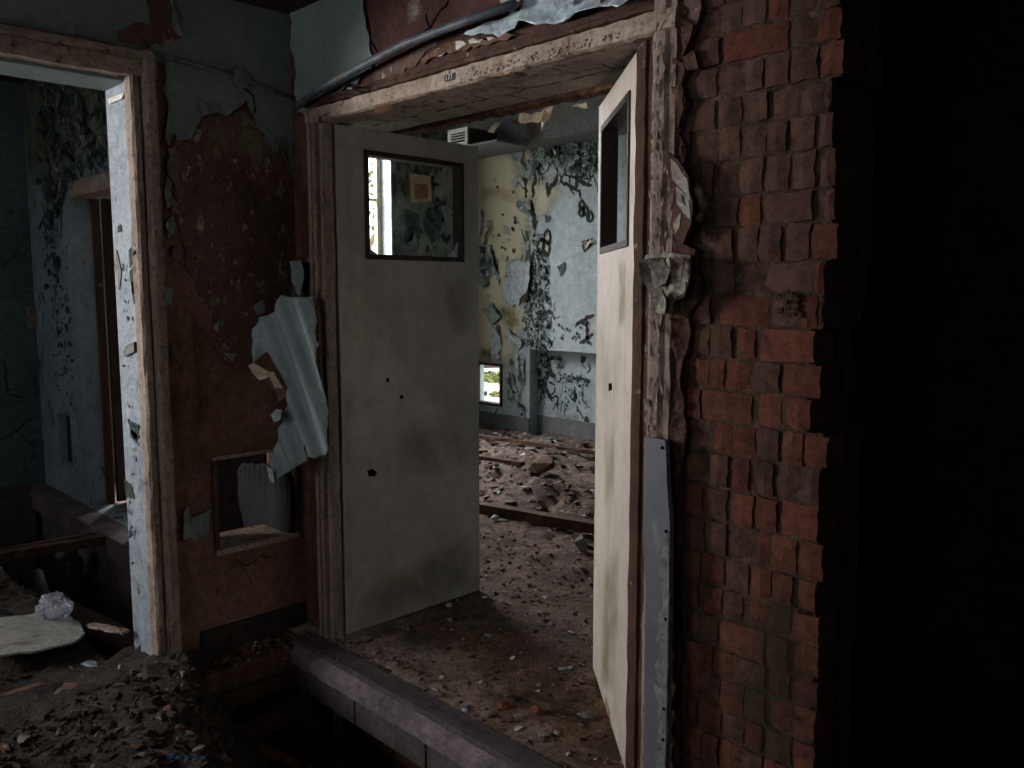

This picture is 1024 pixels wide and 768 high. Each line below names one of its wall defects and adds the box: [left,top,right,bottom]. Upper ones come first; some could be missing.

peeling [124,404,140,539]
spalling [0,0,628,420]
peeling [478,139,598,423]
spalling [639,0,705,768]